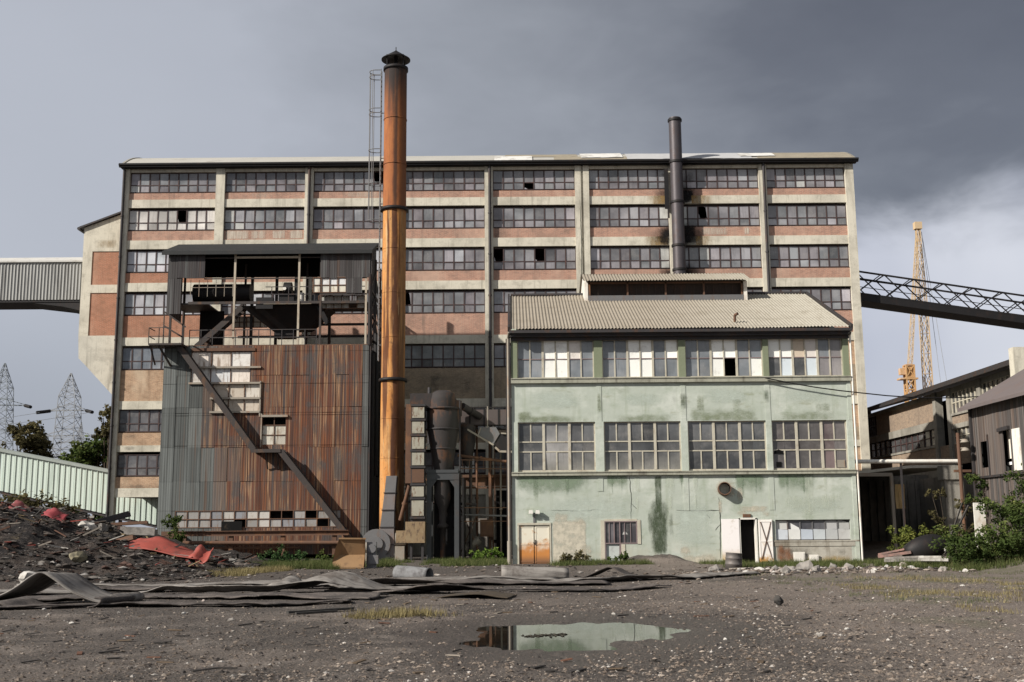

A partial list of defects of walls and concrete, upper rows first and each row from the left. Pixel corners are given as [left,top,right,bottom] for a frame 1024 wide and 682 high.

leakage [652,475,696,553]